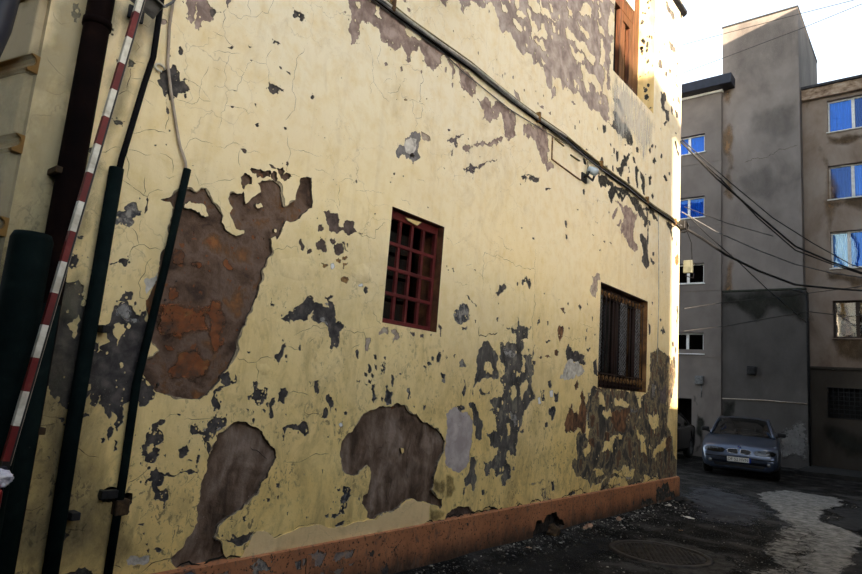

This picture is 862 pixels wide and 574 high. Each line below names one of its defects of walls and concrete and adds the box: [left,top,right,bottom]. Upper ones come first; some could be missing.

crack [105,0,274,299]
peeling [344,0,554,191]
peeling [459,0,681,273]
peeling [48,279,86,426]
flaking render [83,161,313,567]
peeling [270,295,346,351]
peeling [309,380,347,426]
peeling [299,210,363,284]
peeling [453,295,477,330]
peeling [325,302,677,528]
peeling [495,276,531,305]
flaking render [533,512,565,535]